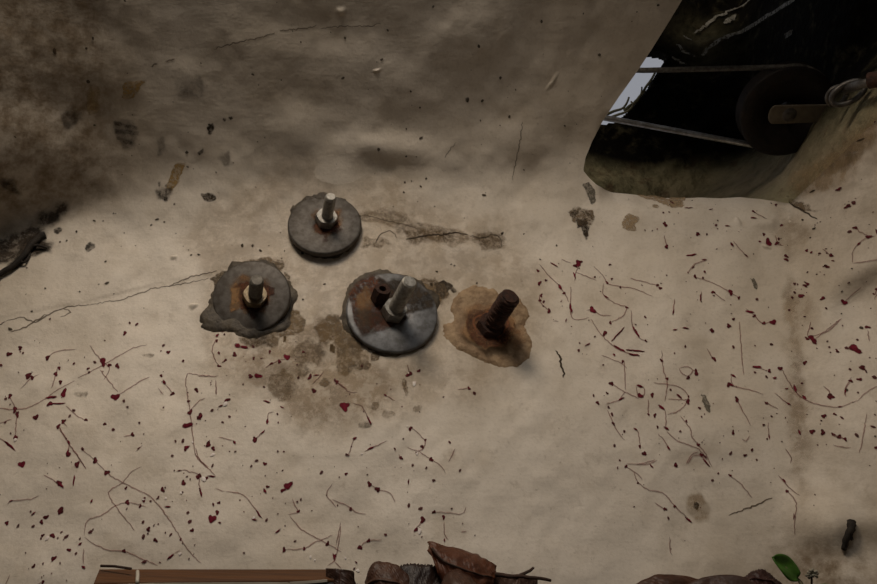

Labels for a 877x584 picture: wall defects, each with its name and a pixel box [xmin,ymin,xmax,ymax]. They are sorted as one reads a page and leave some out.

crack [0,271,215,332]
corrosion [230,275,274,319]
corrosion [349,275,434,335]
corrosion [461,304,526,348]
water stain [178,310,393,496]
water stain [0,345,199,569]
water stain [208,489,261,523]
water stain [282,501,341,568]